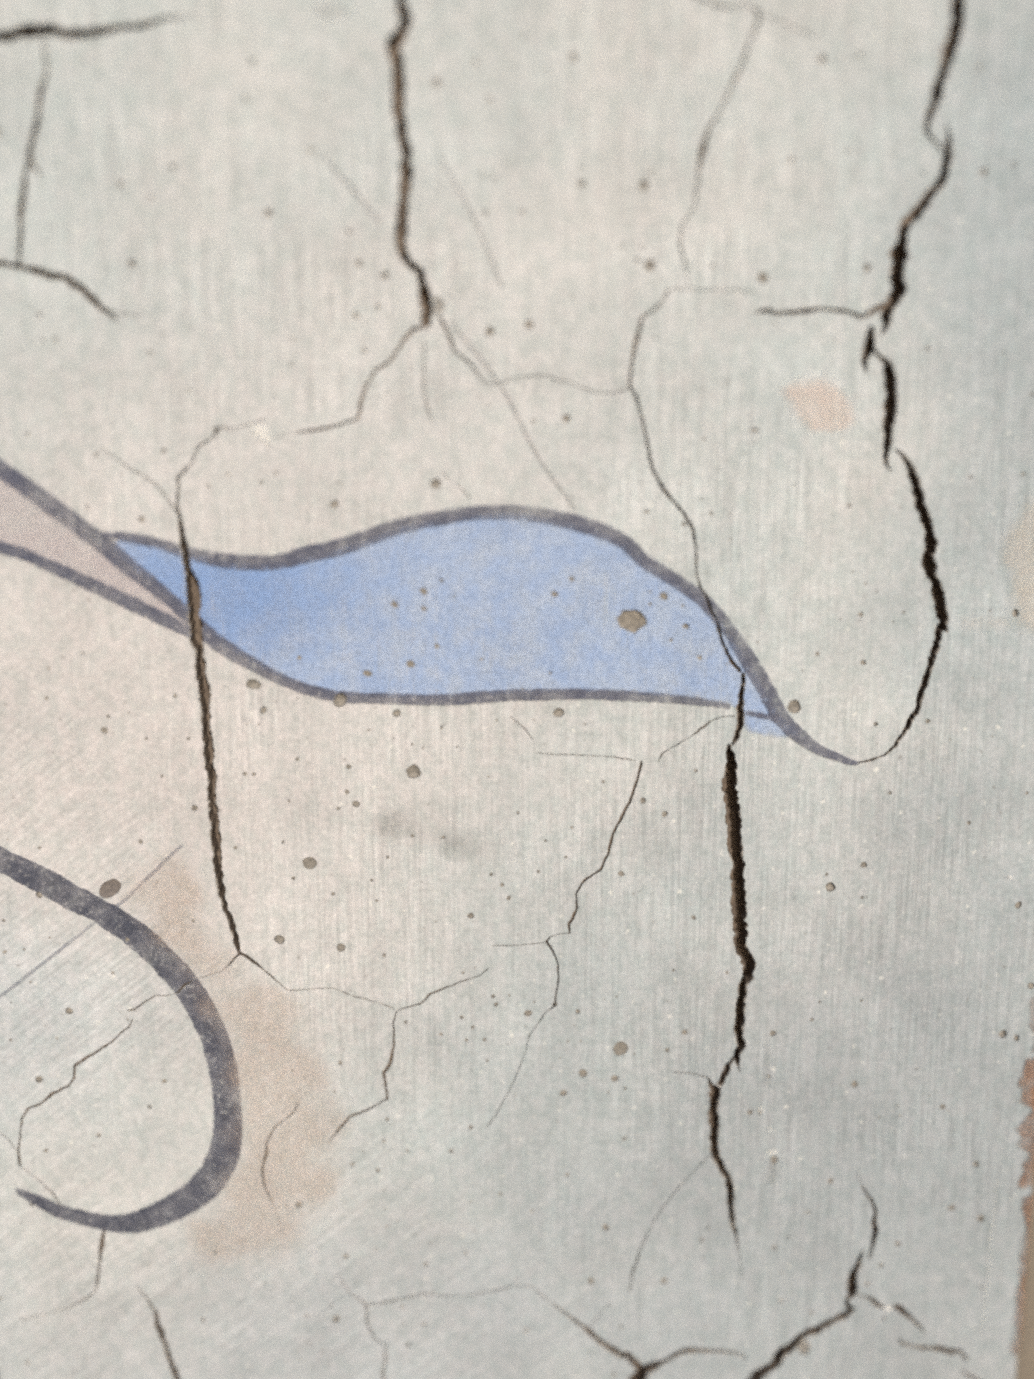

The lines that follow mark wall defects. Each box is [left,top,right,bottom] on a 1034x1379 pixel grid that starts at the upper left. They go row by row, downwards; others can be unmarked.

crack [0,15,197,322]
crack [279,0,965,1292]
crack [1,419,489,1208]
crack [261,1102,299,1237]
crack [20,1230,105,1320]
crack [136,1286,180,1379]
crack [340,1174,977,1379]